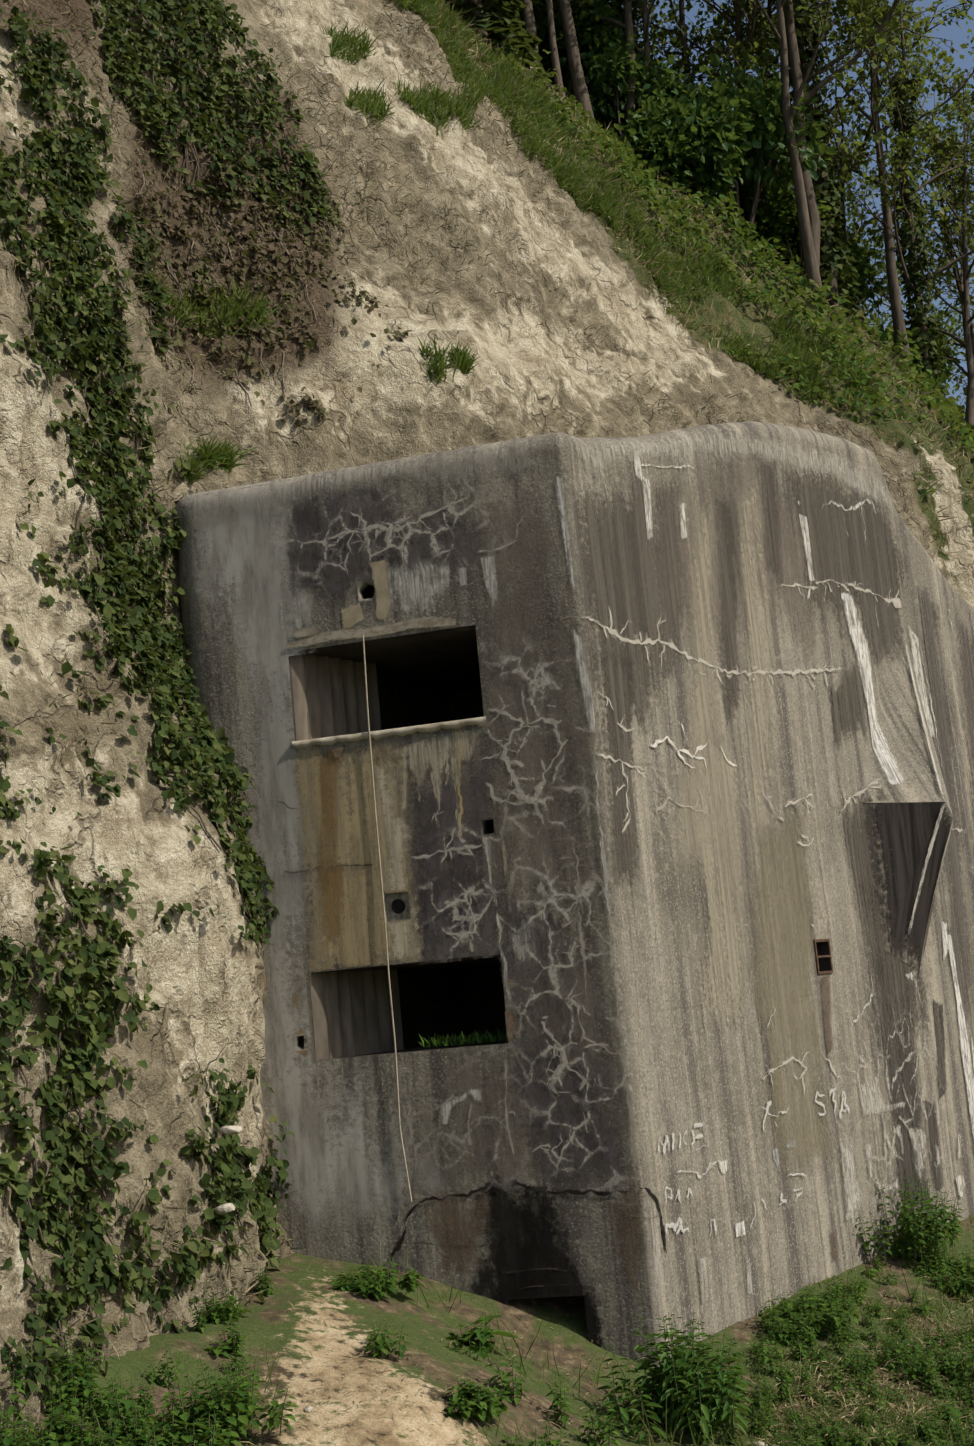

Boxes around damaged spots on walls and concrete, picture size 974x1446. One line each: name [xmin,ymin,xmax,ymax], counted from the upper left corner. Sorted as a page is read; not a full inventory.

crack [284,486,523,576]
crack [780,567,902,608]
crack [563,607,841,687]
rust [455,732,467,837]
crack [285,864,372,874]
rust [296,741,416,978]
damp [175,440,974,1349]
crack [390,656,882,1291]